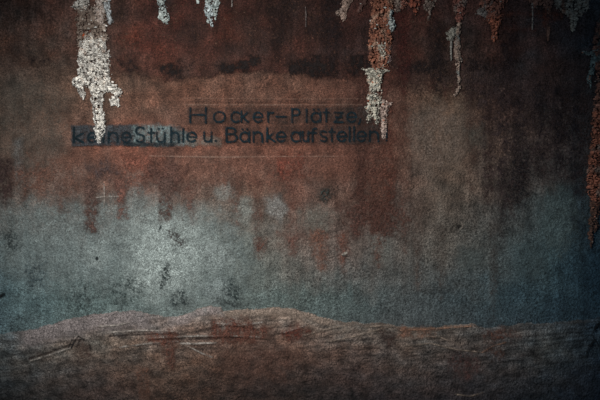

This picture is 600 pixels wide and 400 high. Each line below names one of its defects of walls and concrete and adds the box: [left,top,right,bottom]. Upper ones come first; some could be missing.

leakage [0,0,600,248]